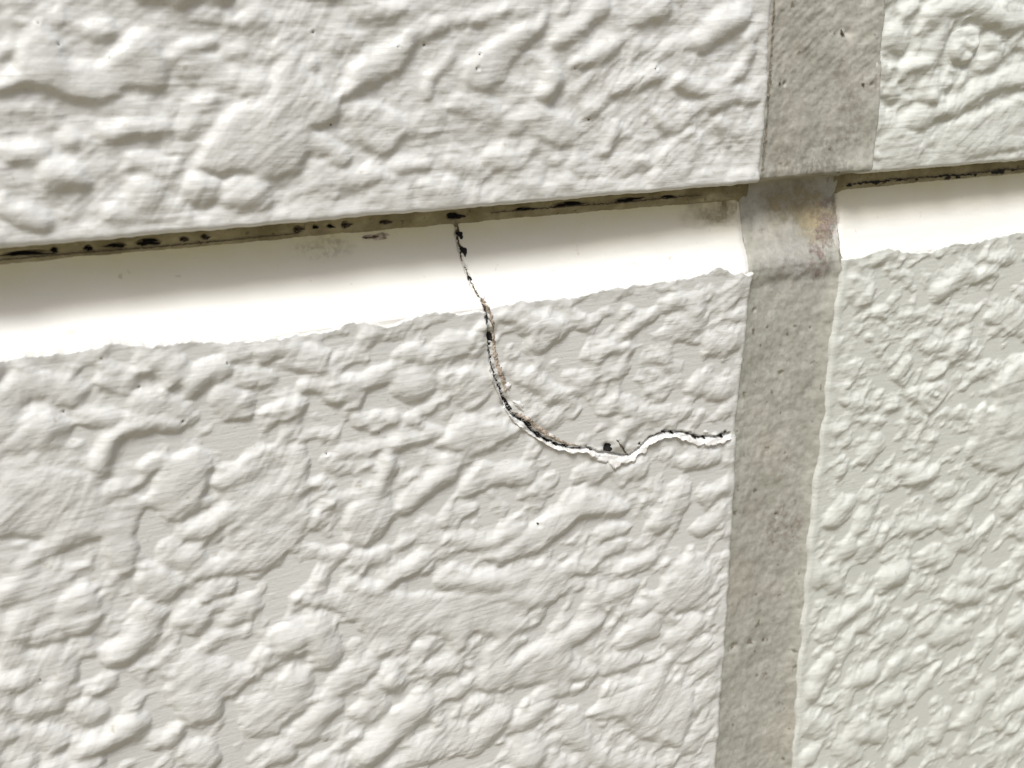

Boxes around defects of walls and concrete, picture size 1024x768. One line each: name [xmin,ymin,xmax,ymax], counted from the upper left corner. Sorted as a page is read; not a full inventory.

crack [447,213,732,470]